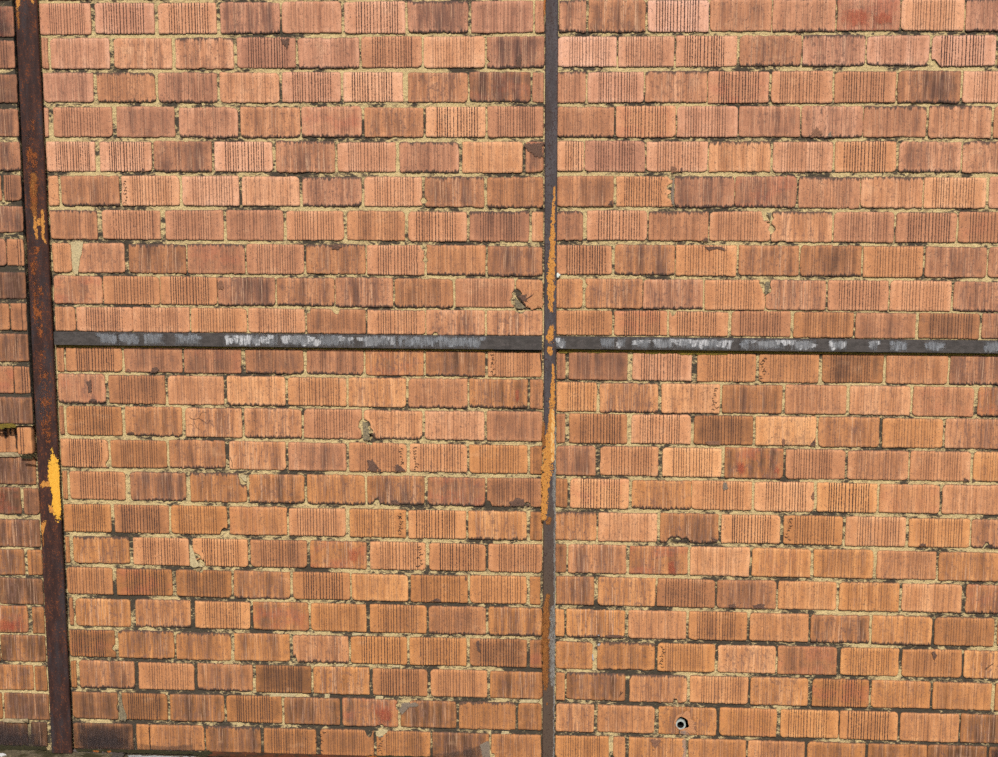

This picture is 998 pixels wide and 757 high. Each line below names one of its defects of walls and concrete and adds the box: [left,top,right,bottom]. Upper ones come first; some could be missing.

rust [26,119,38,209]
rust [30,246,44,338]
rust [540,594,551,690]